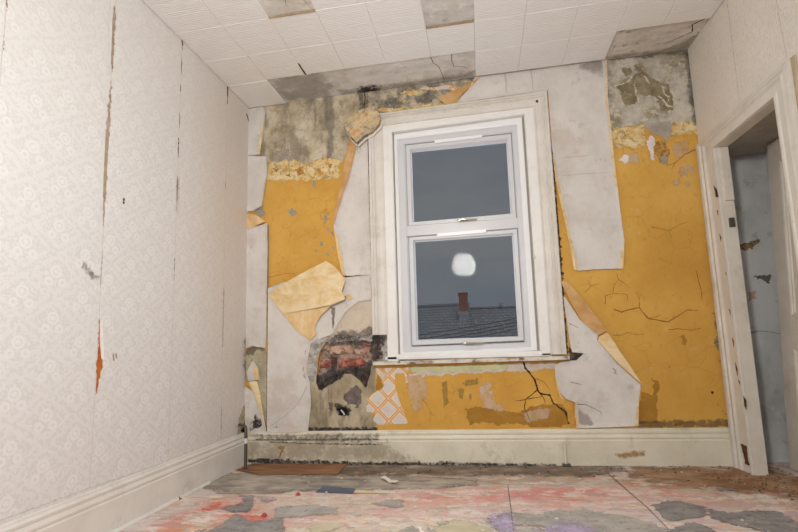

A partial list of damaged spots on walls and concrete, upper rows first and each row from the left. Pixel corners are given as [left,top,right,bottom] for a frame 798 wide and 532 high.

peeling [258,0,315,19]
peeling [421,0,474,29]
flaking render [603,18,709,186]
peeling [246,206,265,229]
peeling [740,239,760,251]
crack [584,271,702,336]
spalling [268,242,388,430]
flaking render [246,346,267,422]
peeling [407,372,427,411]
peeling [465,383,576,427]
crack [517,362,569,424]
peeling [638,379,660,424]